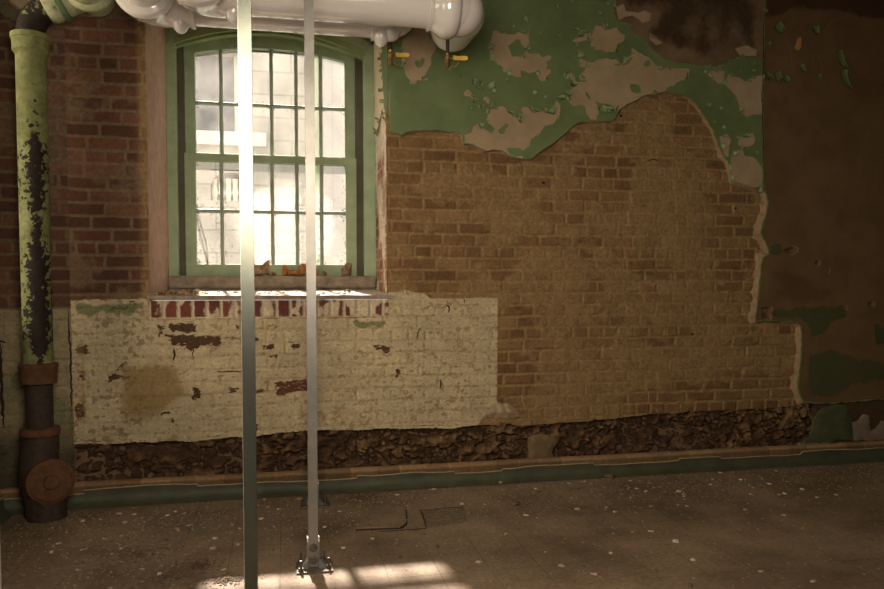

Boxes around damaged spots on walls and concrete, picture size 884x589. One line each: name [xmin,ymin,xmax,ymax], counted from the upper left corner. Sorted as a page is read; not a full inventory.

water stain [633,0,753,51]
flaking render [256,0,884,483]
peeling [156,323,240,351]
spalling [69,435,243,495]